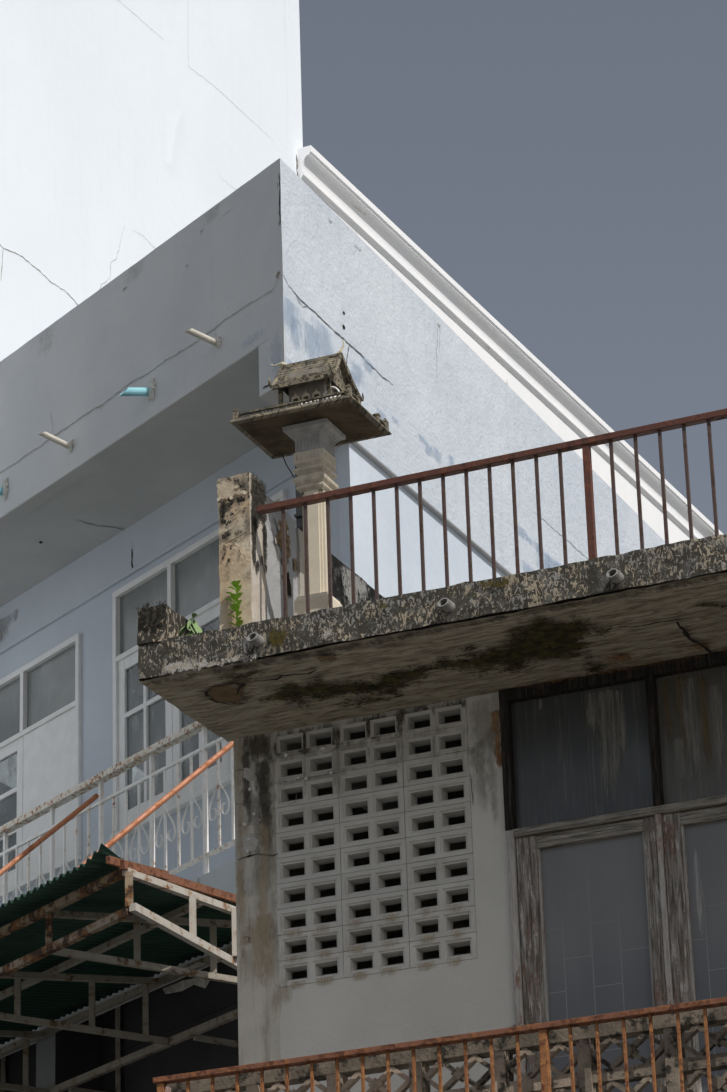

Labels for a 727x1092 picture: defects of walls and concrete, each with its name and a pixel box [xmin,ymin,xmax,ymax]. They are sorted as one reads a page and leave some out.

crack [0,245,78,305]
crack [0,278,392,473]
mould [219,472,268,574]
damp [151,609,507,684]
crack [620,618,716,655]